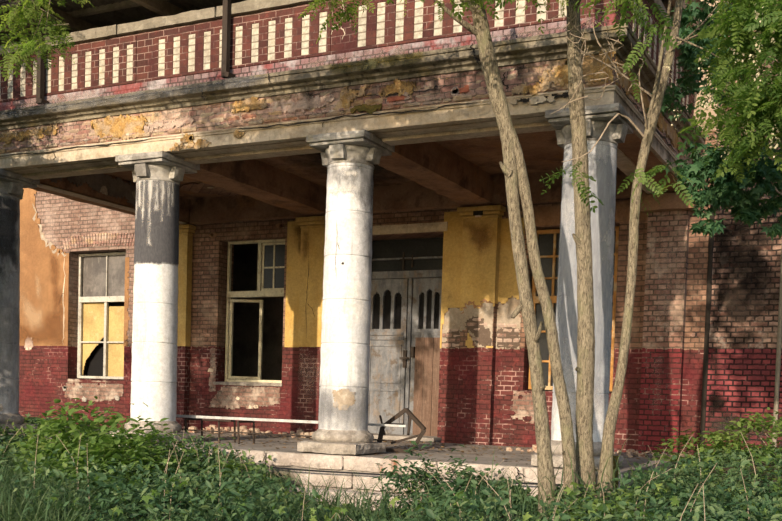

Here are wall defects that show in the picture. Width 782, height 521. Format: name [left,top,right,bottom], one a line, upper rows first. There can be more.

flaking render [230,84,370,114]
flaking render [378,78,416,103]
flaking render [509,59,569,105]
flaking render [582,50,650,115]
flaking render [90,114,211,151]
damp [136,180,173,218]
flaking render [33,173,136,346]
flaking render [191,223,288,410]
flaking render [440,296,521,349]
flaking render [332,389,356,410]
spalling [511,391,534,424]